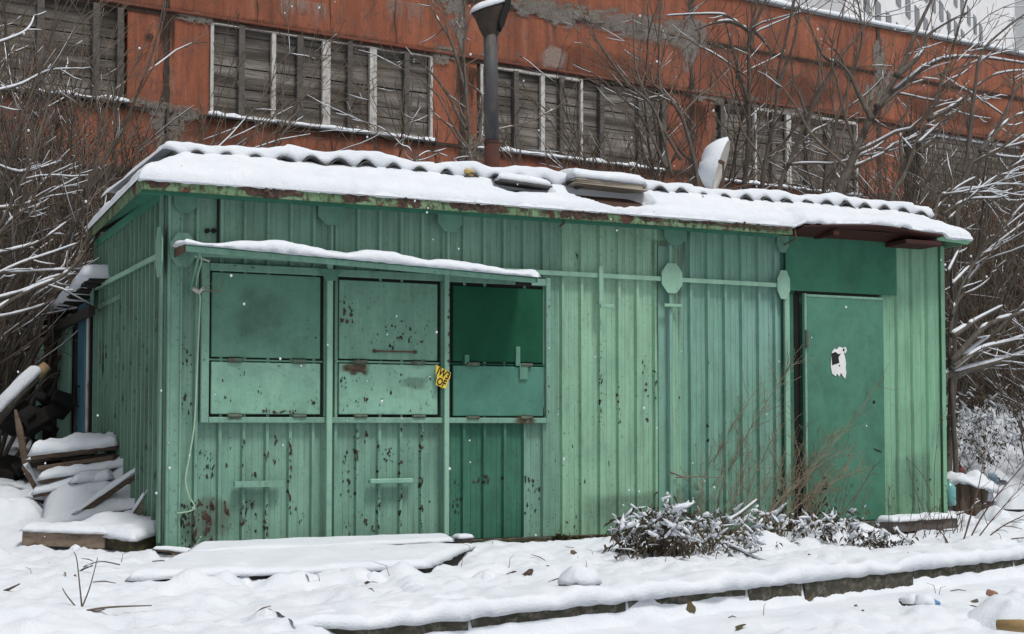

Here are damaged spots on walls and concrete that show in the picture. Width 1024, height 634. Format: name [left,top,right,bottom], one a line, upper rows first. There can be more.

spalling [511,0,707,70]
spalling [127,97,200,148]
corrosion [342,194,372,204]
corrosion [396,197,422,208]
corrosion [450,202,511,214]
corrosion [559,210,609,220]
corrosion [344,364,366,375]